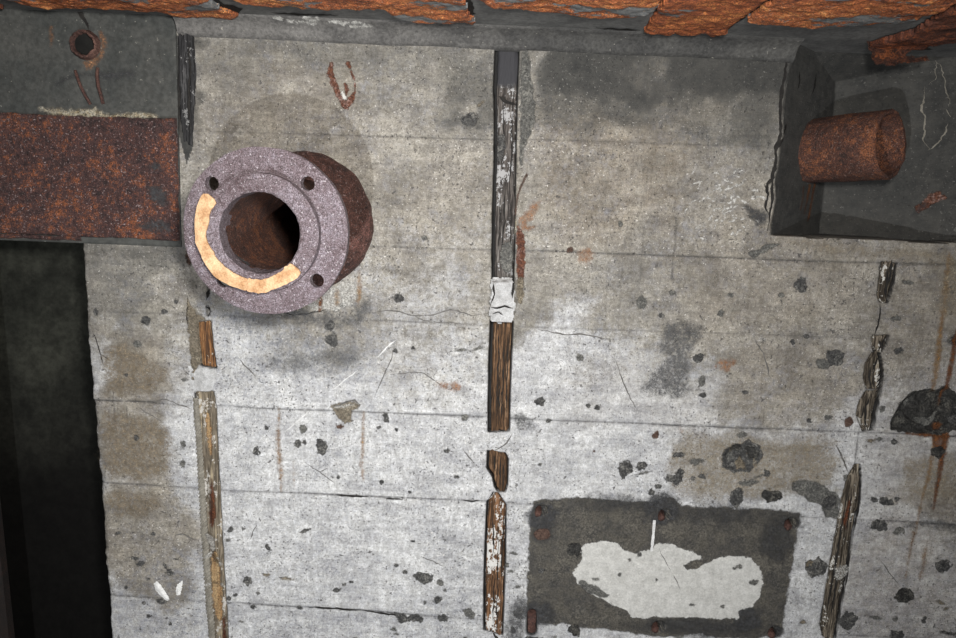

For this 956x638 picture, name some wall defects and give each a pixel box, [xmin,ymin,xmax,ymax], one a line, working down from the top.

rust [932,317,956,397]
spalling [868,386,956,459]
rust [906,433,950,504]
peeling [505,432,840,638]